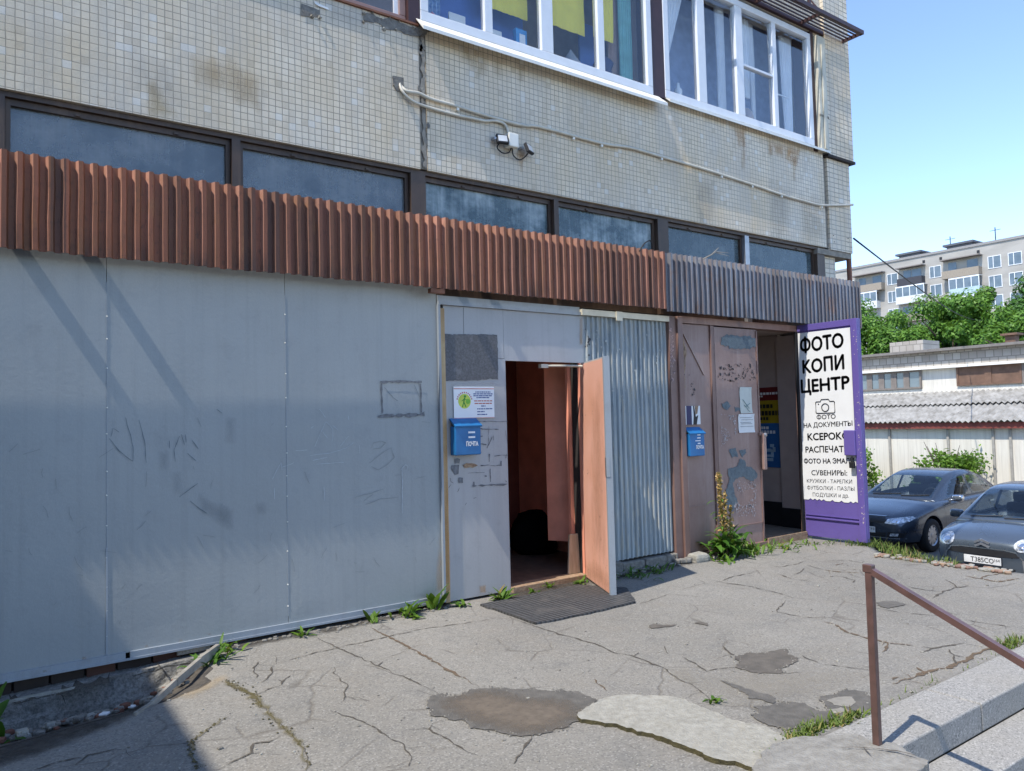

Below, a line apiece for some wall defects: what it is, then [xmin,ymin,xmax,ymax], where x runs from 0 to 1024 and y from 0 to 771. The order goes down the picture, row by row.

peeling [721,401,758,517]
crack [642,560,1019,684]
crack [216,736,279,771]
crack [252,617,734,767]